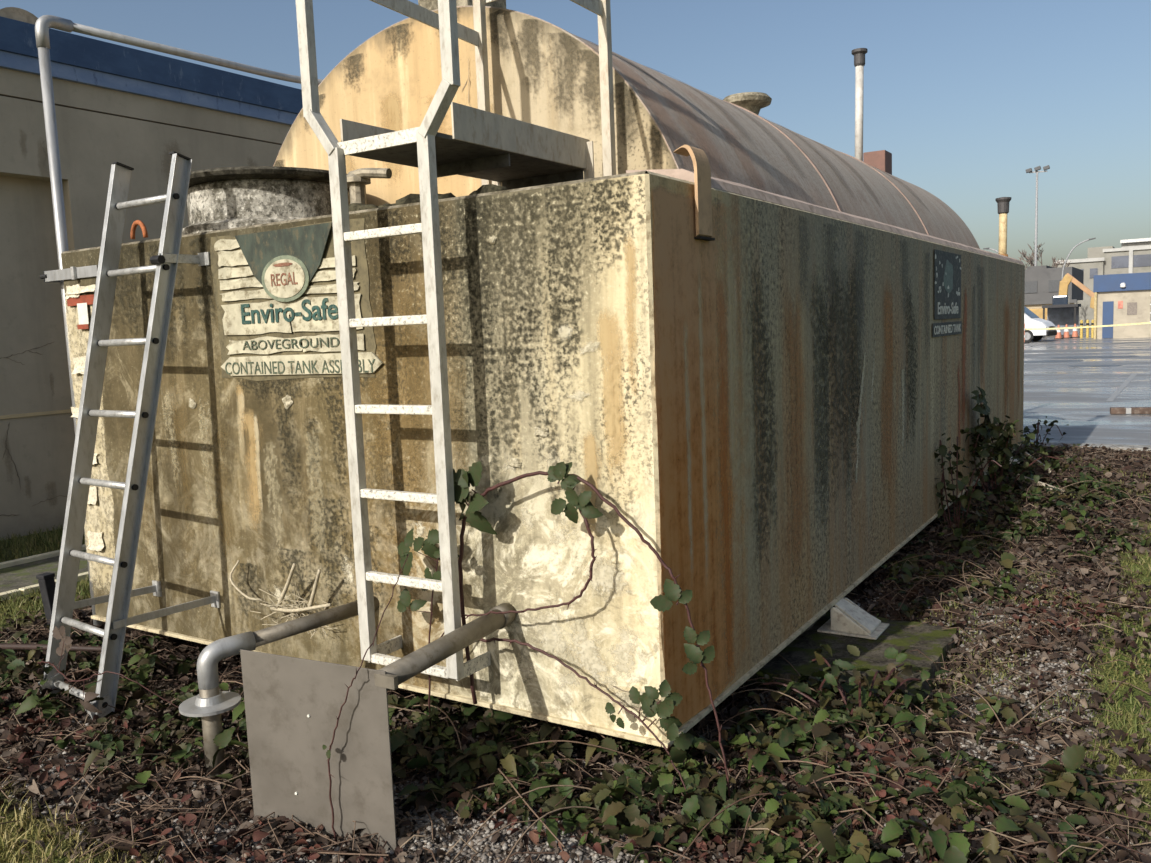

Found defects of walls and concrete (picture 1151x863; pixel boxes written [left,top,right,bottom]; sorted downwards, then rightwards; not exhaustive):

damp [167,237,213,359]
damp [241,379,319,483]
damp [321,377,346,485]
damp [379,211,406,288]
damp [439,193,558,489]
damp [548,178,629,370]
corrosion [652,187,745,724]
damp [749,271,778,563]
damp [811,260,863,526]
damp [239,563,260,615]
damp [280,549,313,602]
damp [308,499,354,606]